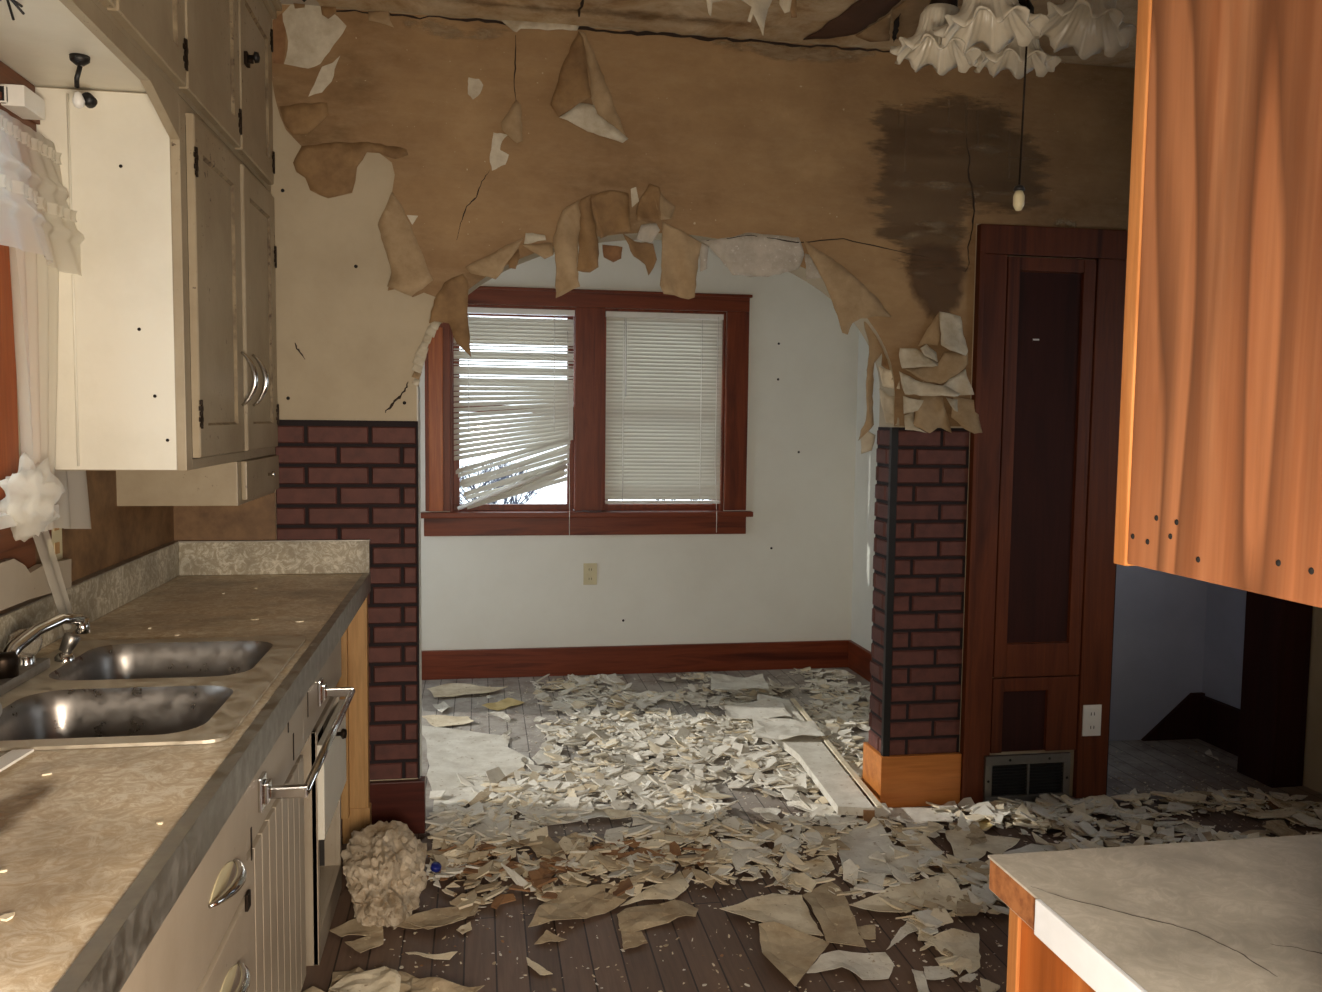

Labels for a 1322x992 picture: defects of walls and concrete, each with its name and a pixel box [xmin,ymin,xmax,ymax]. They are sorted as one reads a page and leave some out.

peeling [280,5,408,198]
crack [336,10,516,98]
flaking render [468,77,483,99]
peeling [490,100,523,171]
peeling [502,20,628,143]
crack [577,0,890,52]
leakage [872,96,1048,316]
peeling [378,184,702,386]
peeling [803,240,891,335]